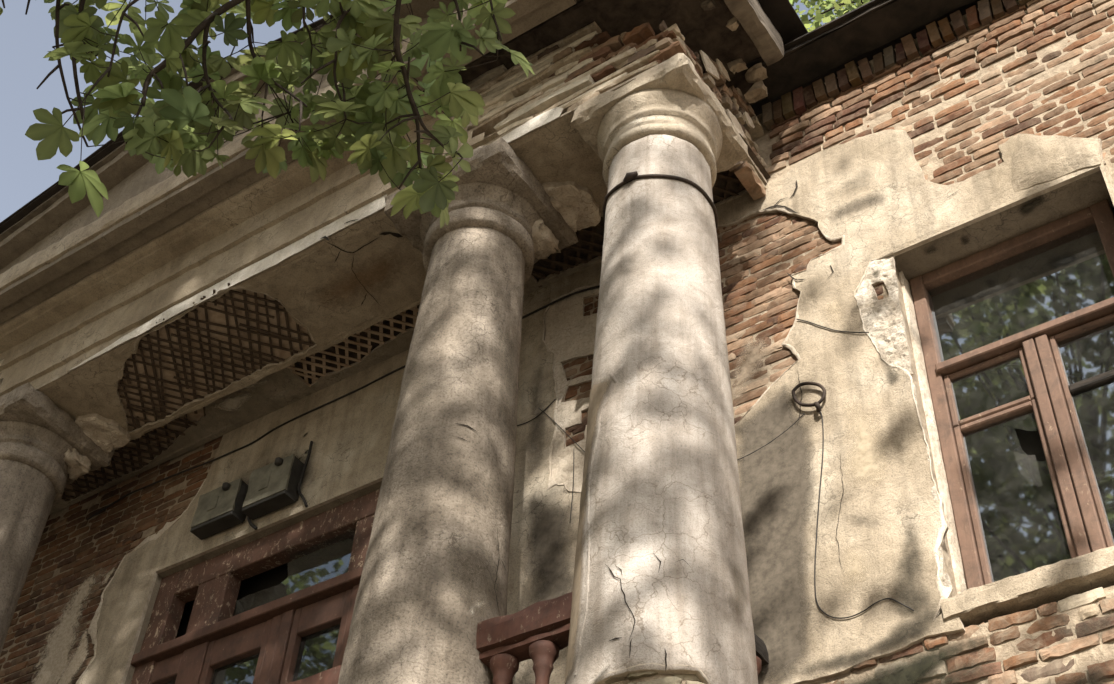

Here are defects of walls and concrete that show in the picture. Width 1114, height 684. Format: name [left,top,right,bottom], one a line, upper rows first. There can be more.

peeling [502,107,563,143]
flaking render [531,0,1114,426]
spalling [0,194,420,684]
spalling [542,283,618,684]
crack [606,565,635,658]
spalling [592,663,711,684]
water stain [738,390,936,677]